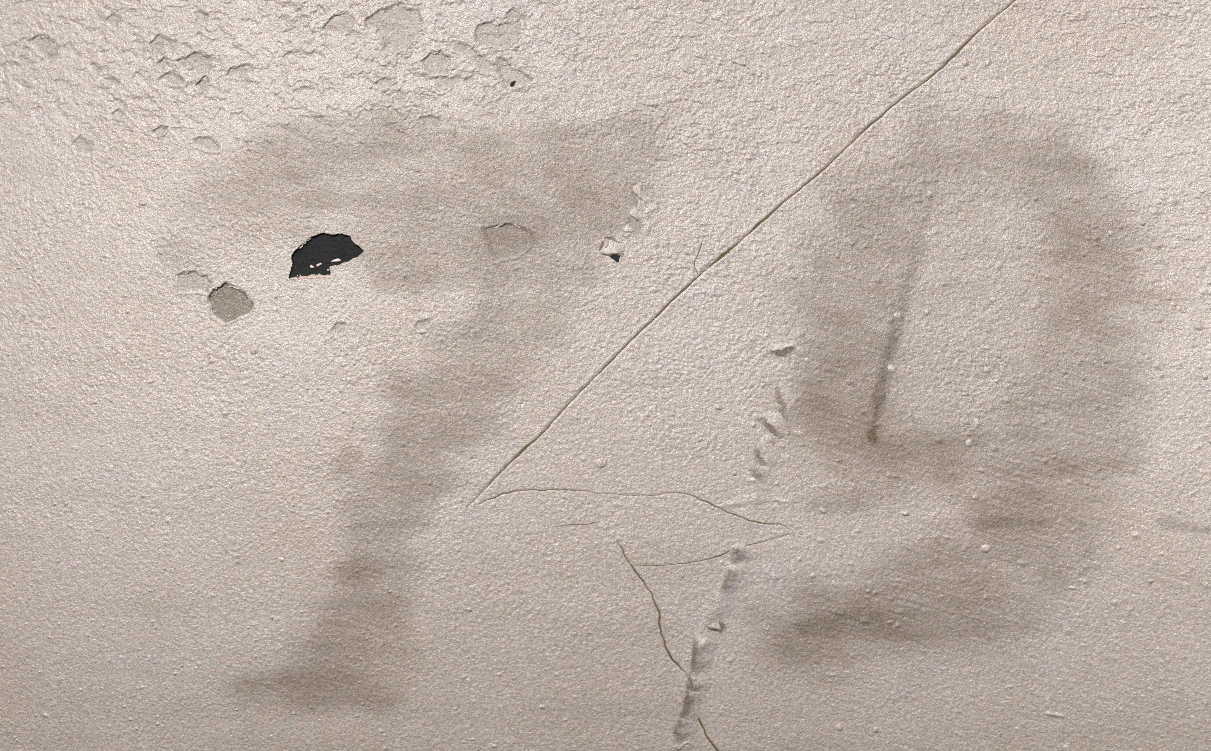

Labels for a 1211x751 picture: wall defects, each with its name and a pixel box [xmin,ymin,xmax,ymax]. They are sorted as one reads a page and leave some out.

spalling [289,233,363,279]
peeling [178,270,254,322]
crack [468,0,1015,674]
crack [698,718,719,751]